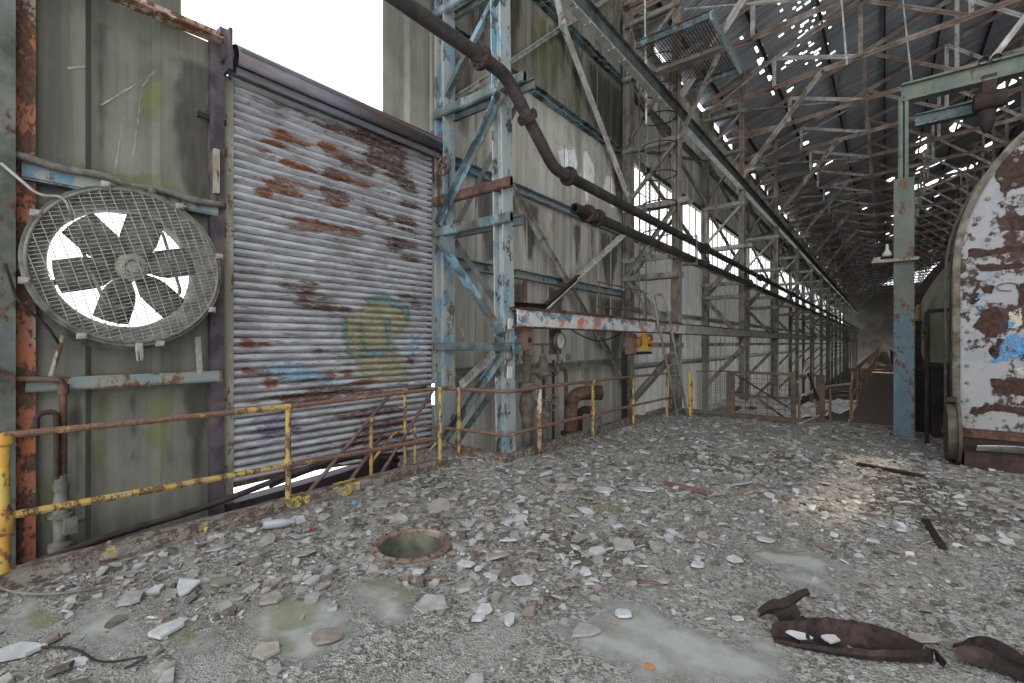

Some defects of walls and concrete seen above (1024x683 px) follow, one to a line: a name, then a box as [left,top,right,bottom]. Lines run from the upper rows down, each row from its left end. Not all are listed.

rust [253,99,421,262]